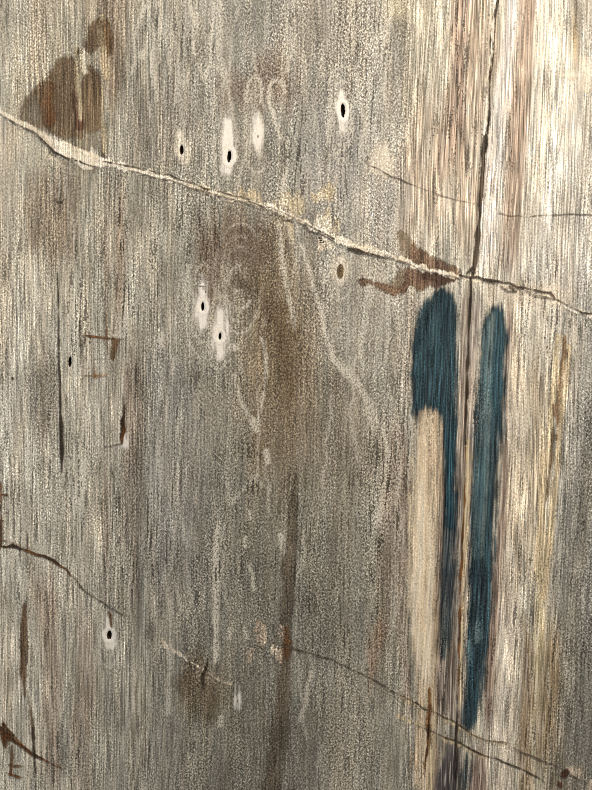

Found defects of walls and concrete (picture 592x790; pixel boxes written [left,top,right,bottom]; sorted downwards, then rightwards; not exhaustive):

leakage [21,15,113,159]
crack [0,0,592,338]
crack [0,482,123,615]
crack [397,341,507,764]
crack [0,603,61,790]
crack [161,638,232,687]
crack [283,645,351,669]
crack [357,671,428,711]
crack [494,750,556,778]
crack [557,769,580,788]